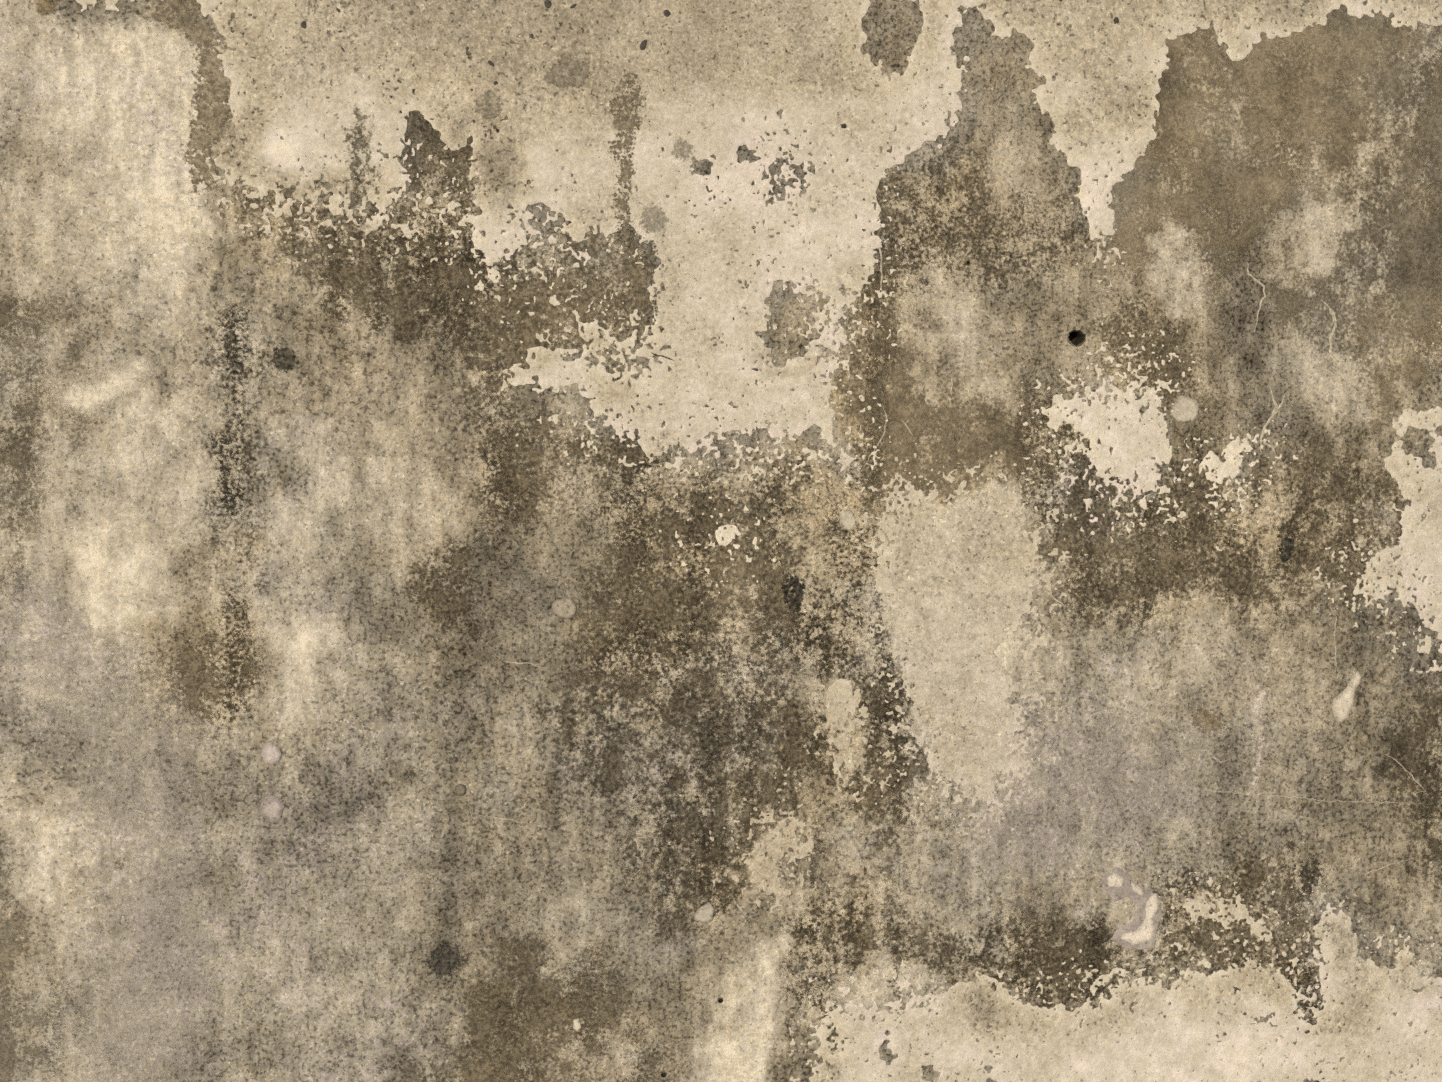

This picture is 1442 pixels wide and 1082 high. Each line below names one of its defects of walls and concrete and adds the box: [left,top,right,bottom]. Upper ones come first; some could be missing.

peeling [76,0,135,13]
leakage [149,0,231,199]
leakage [544,53,590,88]
leakage [1086,2,1442,431]
peeling [174,0,1442,776]
leakage [232,73,1407,1046]
leakage [1374,654,1442,897]
peeling [789,872,1442,1082]